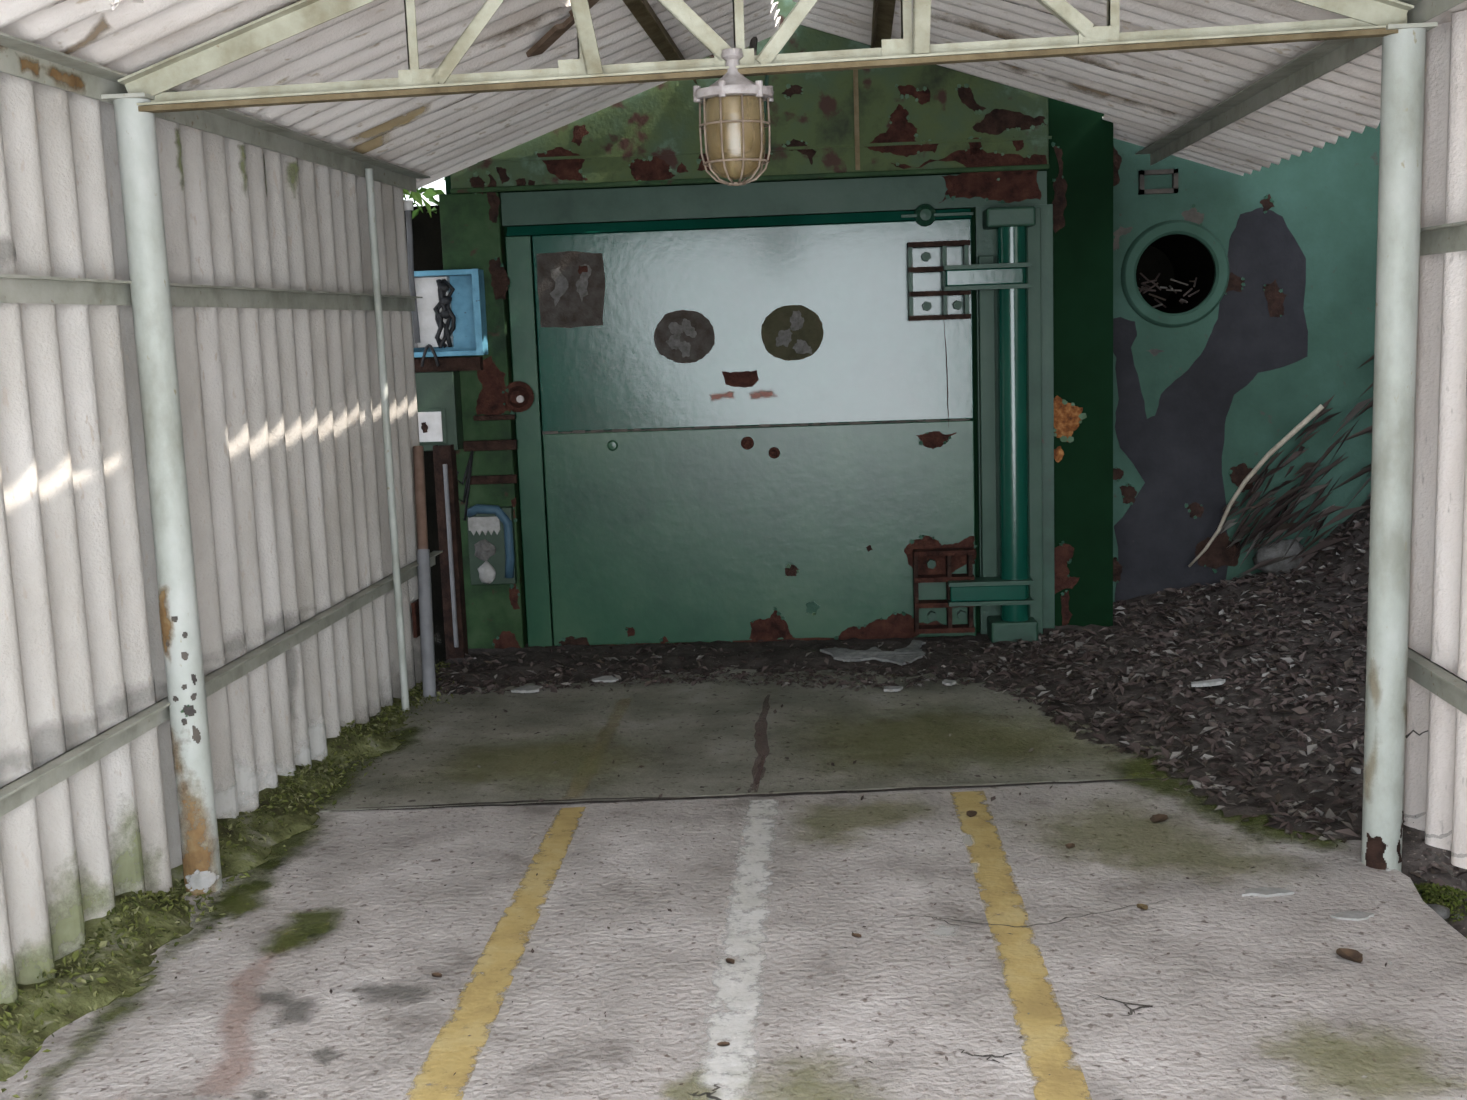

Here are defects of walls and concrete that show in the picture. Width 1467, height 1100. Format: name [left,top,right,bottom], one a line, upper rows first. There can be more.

rust [939,142,1067,234]
rust [1054,395,1087,462]
rust [904,535,977,575]
rust [159,589,172,655]
rust [730,607,947,642]
crack [347,695,1202,811]
rust [171,733,217,896]
rust [1365,811,1404,871]
leakage [0,816,146,1004]
leakage [260,994,309,1020]
leakage [358,986,424,1000]
leakage [315,1049,335,1063]